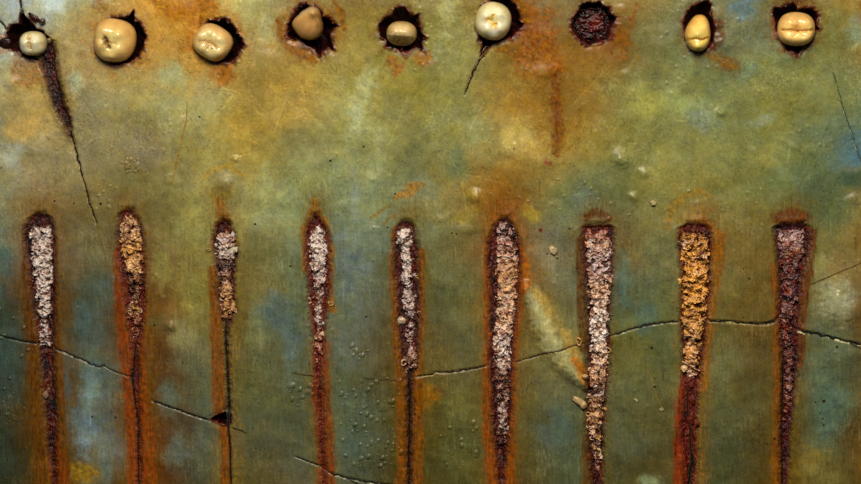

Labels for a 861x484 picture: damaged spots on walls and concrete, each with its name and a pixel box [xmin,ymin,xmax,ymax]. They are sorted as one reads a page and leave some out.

rust [0,0,439,146]
crack [464,46,489,95]
rust [491,0,645,169]
crack [69,130,107,261]
rust [3,182,174,484]
crack [0,318,246,484]
rust [194,161,254,484]
rust [368,180,445,484]
crack [364,365,488,484]
rust [469,176,540,484]
crack [709,318,776,326]
crack [797,329,861,349]